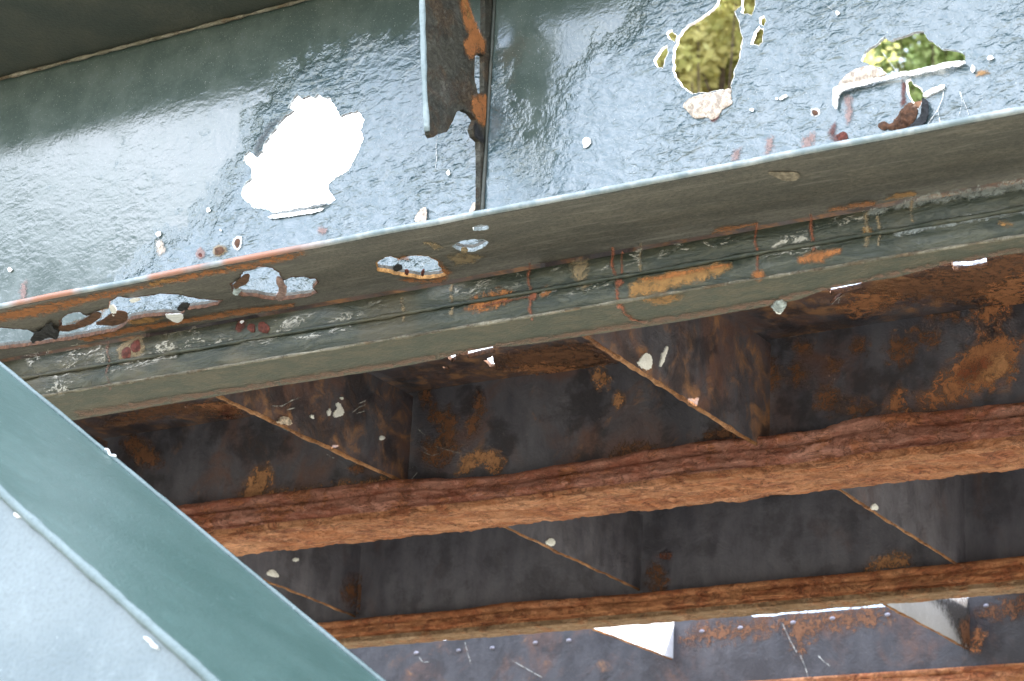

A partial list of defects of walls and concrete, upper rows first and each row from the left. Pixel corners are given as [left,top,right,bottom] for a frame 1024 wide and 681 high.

corrosion [460,0,485,58]
peeling [683,88,733,120]
peeling [923,84,945,97]
peeling [268,202,329,219]
peeling [26,322,59,365]
corrosion [0,236,303,342]
peeling [165,302,190,323]
spalling [236,314,360,345]
corrosion [610,244,729,323]
corrosion [834,253,1024,413]
corrosion [97,395,399,486]
corrosion [679,593,1024,657]